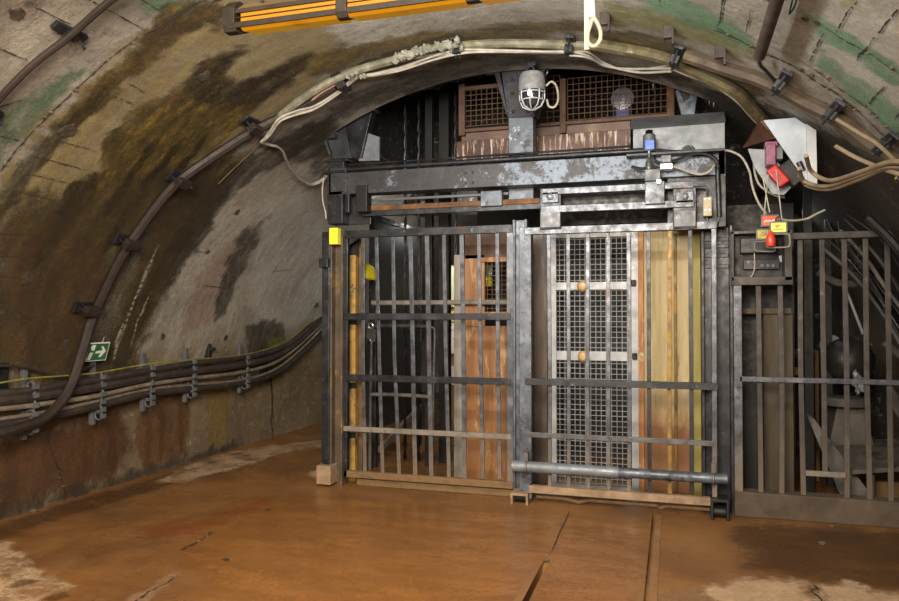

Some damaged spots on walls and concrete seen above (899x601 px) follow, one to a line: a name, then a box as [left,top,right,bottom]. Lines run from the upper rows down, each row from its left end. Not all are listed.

water stain [715,73,762,99]
water stain [0,0,715,383]
crack [811,585,822,601]